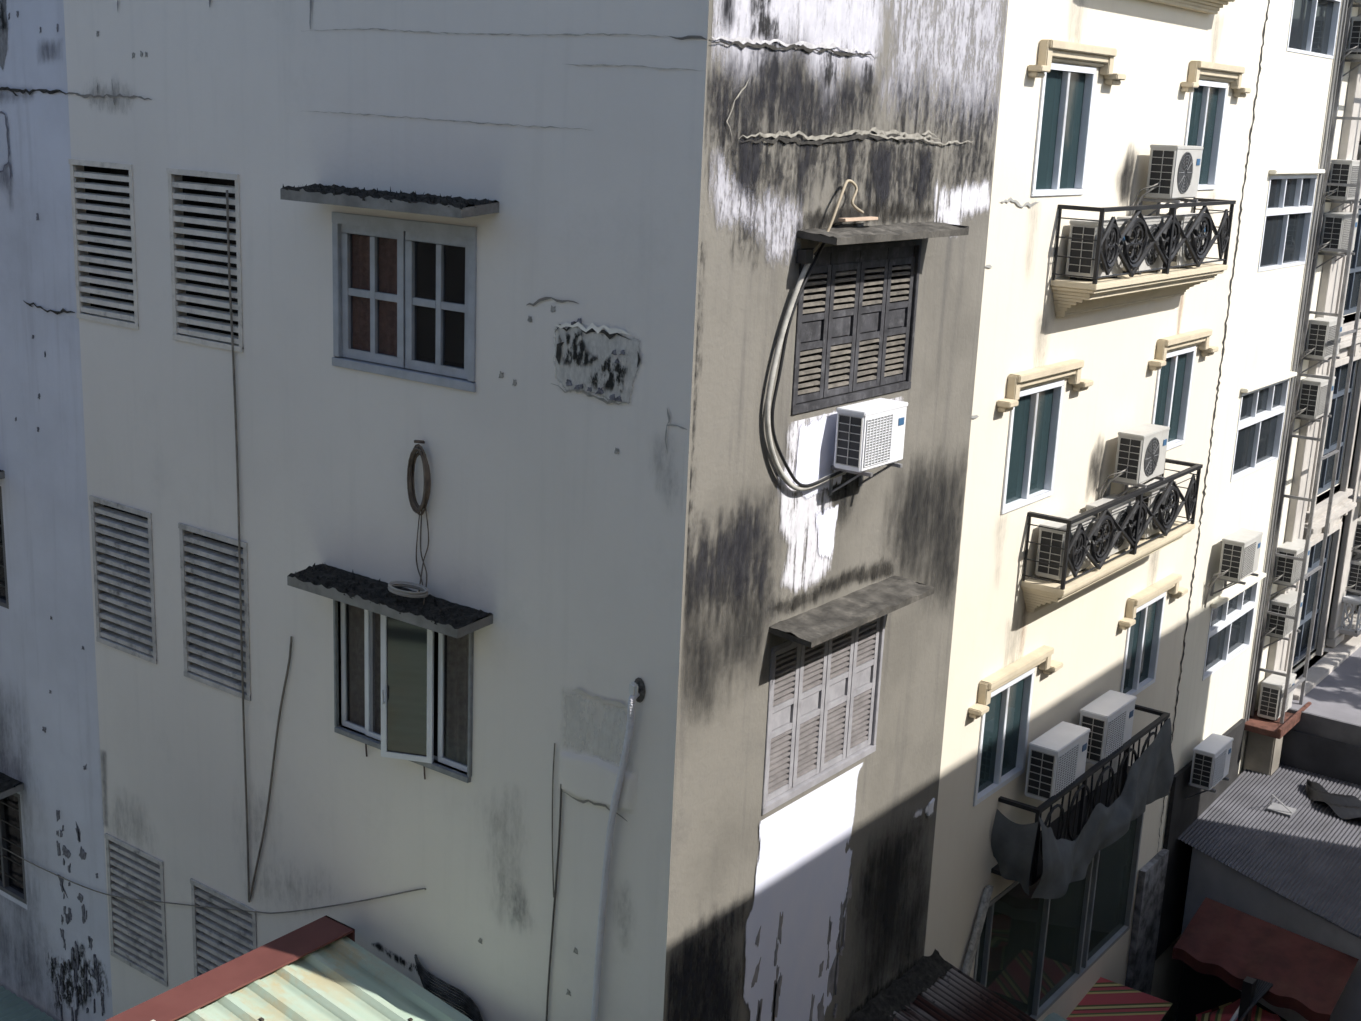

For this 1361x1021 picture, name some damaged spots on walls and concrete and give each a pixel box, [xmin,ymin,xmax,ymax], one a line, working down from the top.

peeling [0,0,19,69]
crack [308,28,973,146]
mould [706,0,998,243]
flaking render [551,305,640,405]
water stain [685,400,774,702]
peeling [794,411,842,559]
water stain [836,474,856,518]
water stain [897,467,963,595]
water stain [668,907,744,1021]
peeling [743,763,863,1021]
water stain [862,828,922,994]